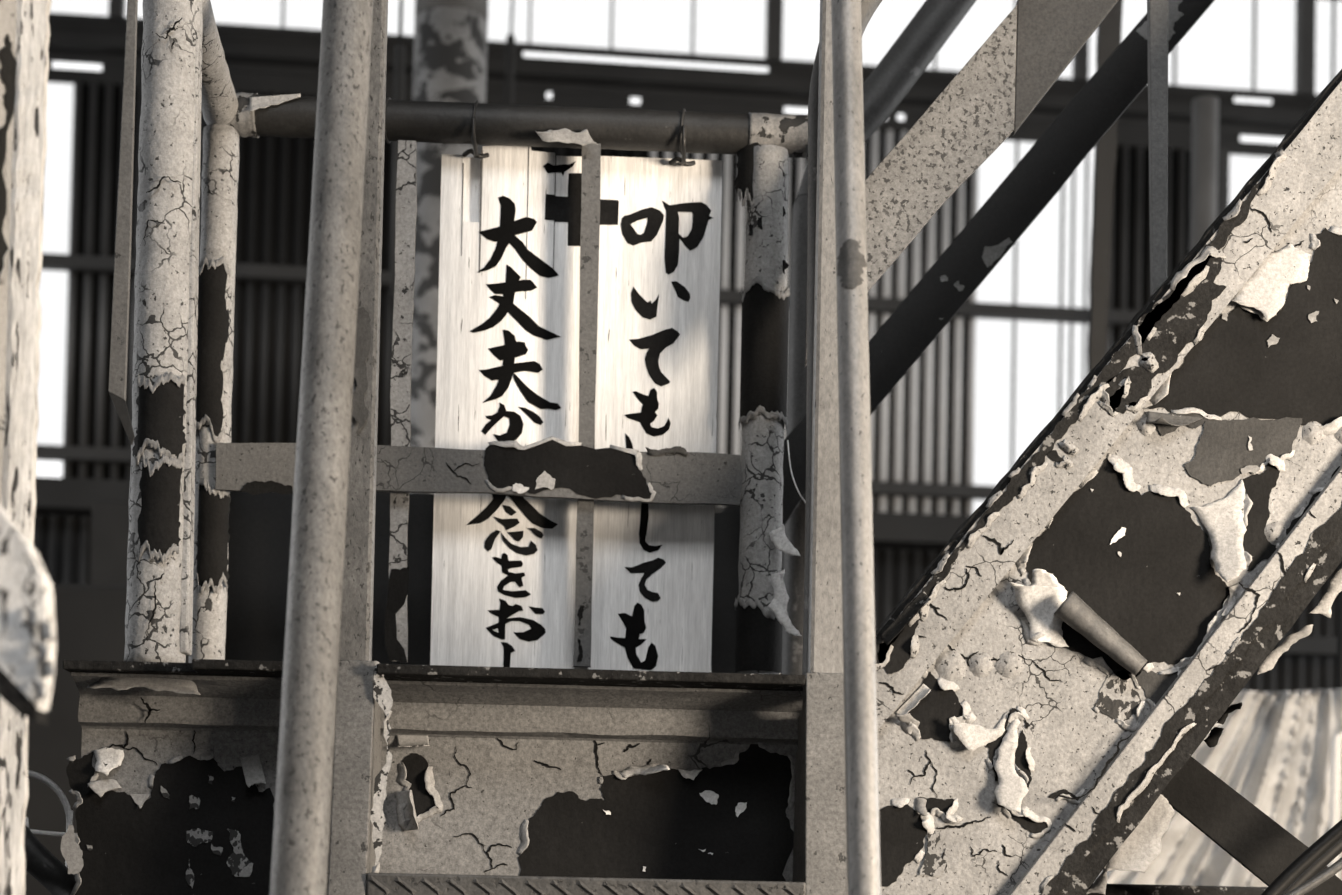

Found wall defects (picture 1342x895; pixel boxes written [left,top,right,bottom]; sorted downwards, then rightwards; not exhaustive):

peeling [132,256,231,564]
peeling [484,436,688,502]
peeling [1009,226,1342,732]
crack [917,535,1062,682]
peeling [66,747,275,895]
crack [441,747,512,873]
crack [594,740,652,775]
peeling [518,742,796,882]
crack [879,682,903,695]
crack [908,750,1012,876]
peeling [895,671,1052,838]
crack [1054,734,1132,832]